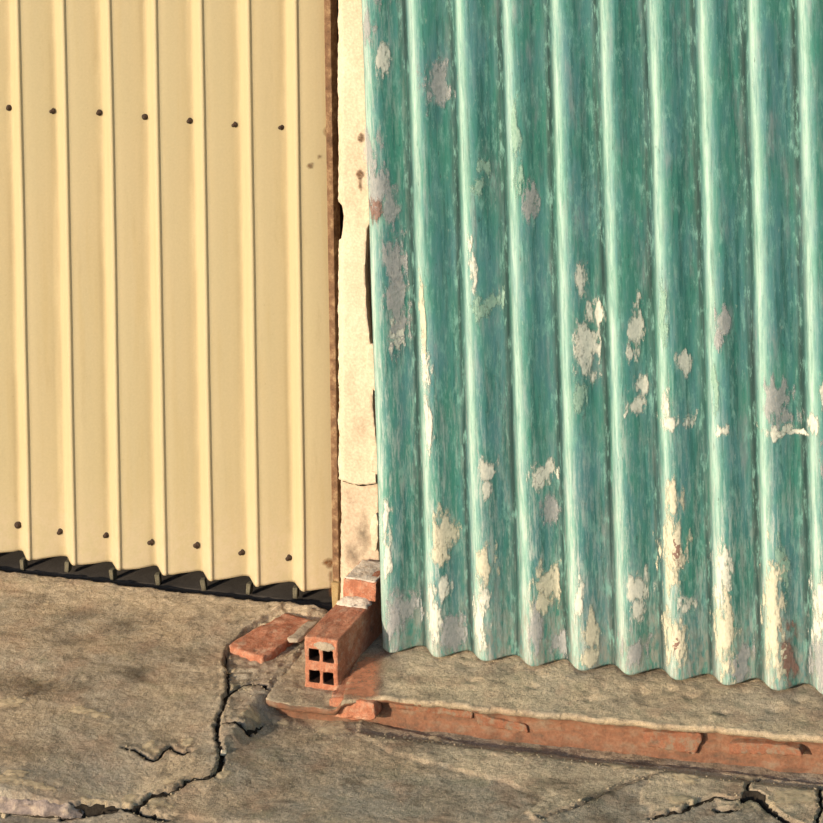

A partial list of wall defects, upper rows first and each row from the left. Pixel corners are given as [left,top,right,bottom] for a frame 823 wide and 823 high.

peeling [382,241,435,456]
peeling [572,265,604,413]
peeling [626,292,644,362]
peeling [762,375,823,443]
peeling [386,502,500,652]
peeling [528,560,567,655]
peeling [627,478,697,667]
peeling [713,538,755,684]
peeling [760,531,799,687]
peeling [809,574,823,691]
crack [118,655,269,823]
crack [649,777,823,823]